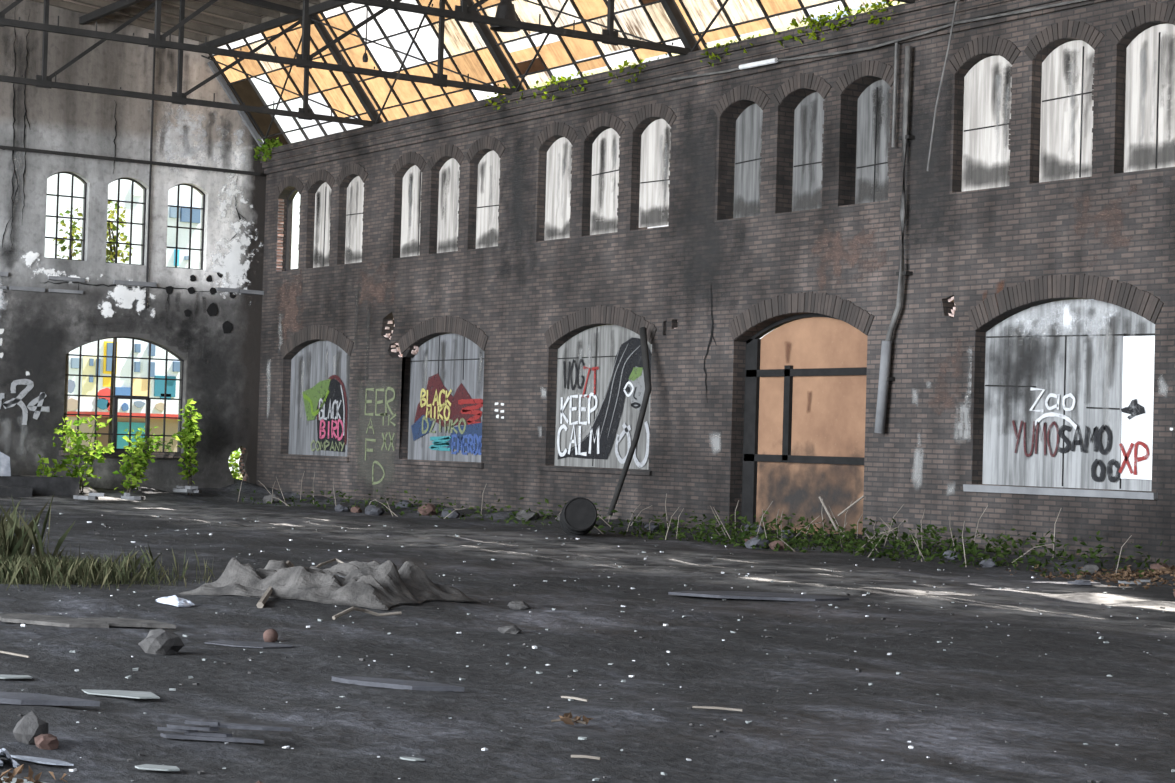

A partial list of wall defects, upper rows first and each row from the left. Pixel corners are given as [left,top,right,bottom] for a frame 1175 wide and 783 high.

water stain [162,112,245,159]
peeling [21,251,102,283]
peeling [188,173,261,333]
peeling [98,280,173,318]